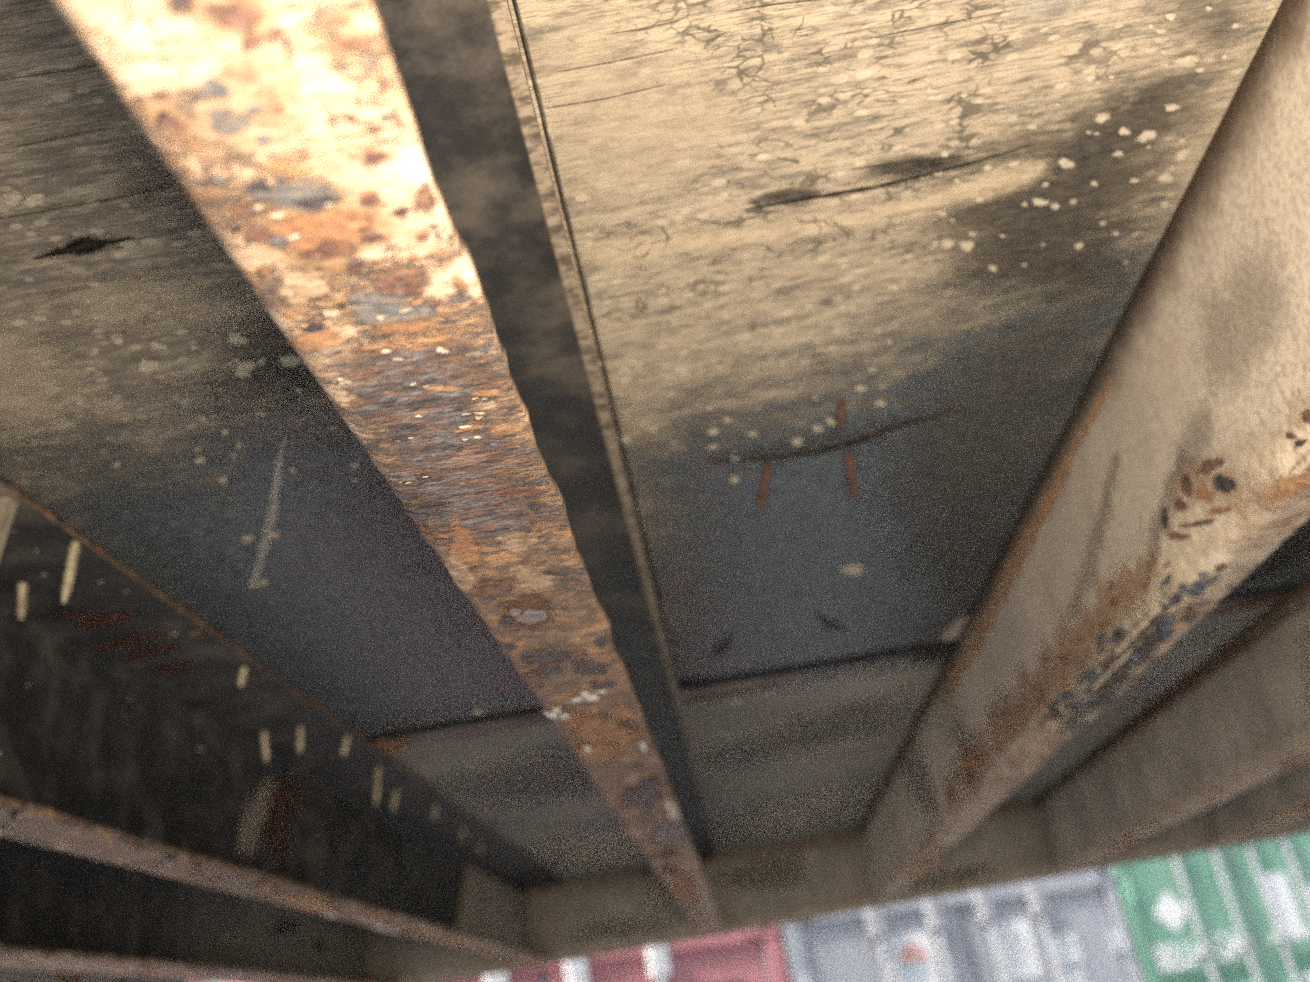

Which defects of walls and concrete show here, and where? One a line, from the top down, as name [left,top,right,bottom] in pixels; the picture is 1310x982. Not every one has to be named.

corrosion [168,0,304,56]
crack [564,21,676,71]
crack [732,0,813,24]
crack [34,237,134,259]
crack [594,133,1035,321]
water stain [137,342,167,373]
water stain [227,333,302,377]
corrosion [229,177,557,631]
water stain [512,0,1204,704]
corrosion [1160,409,1310,540]
water stain [26,378,538,735]
corrosion [502,636,647,763]